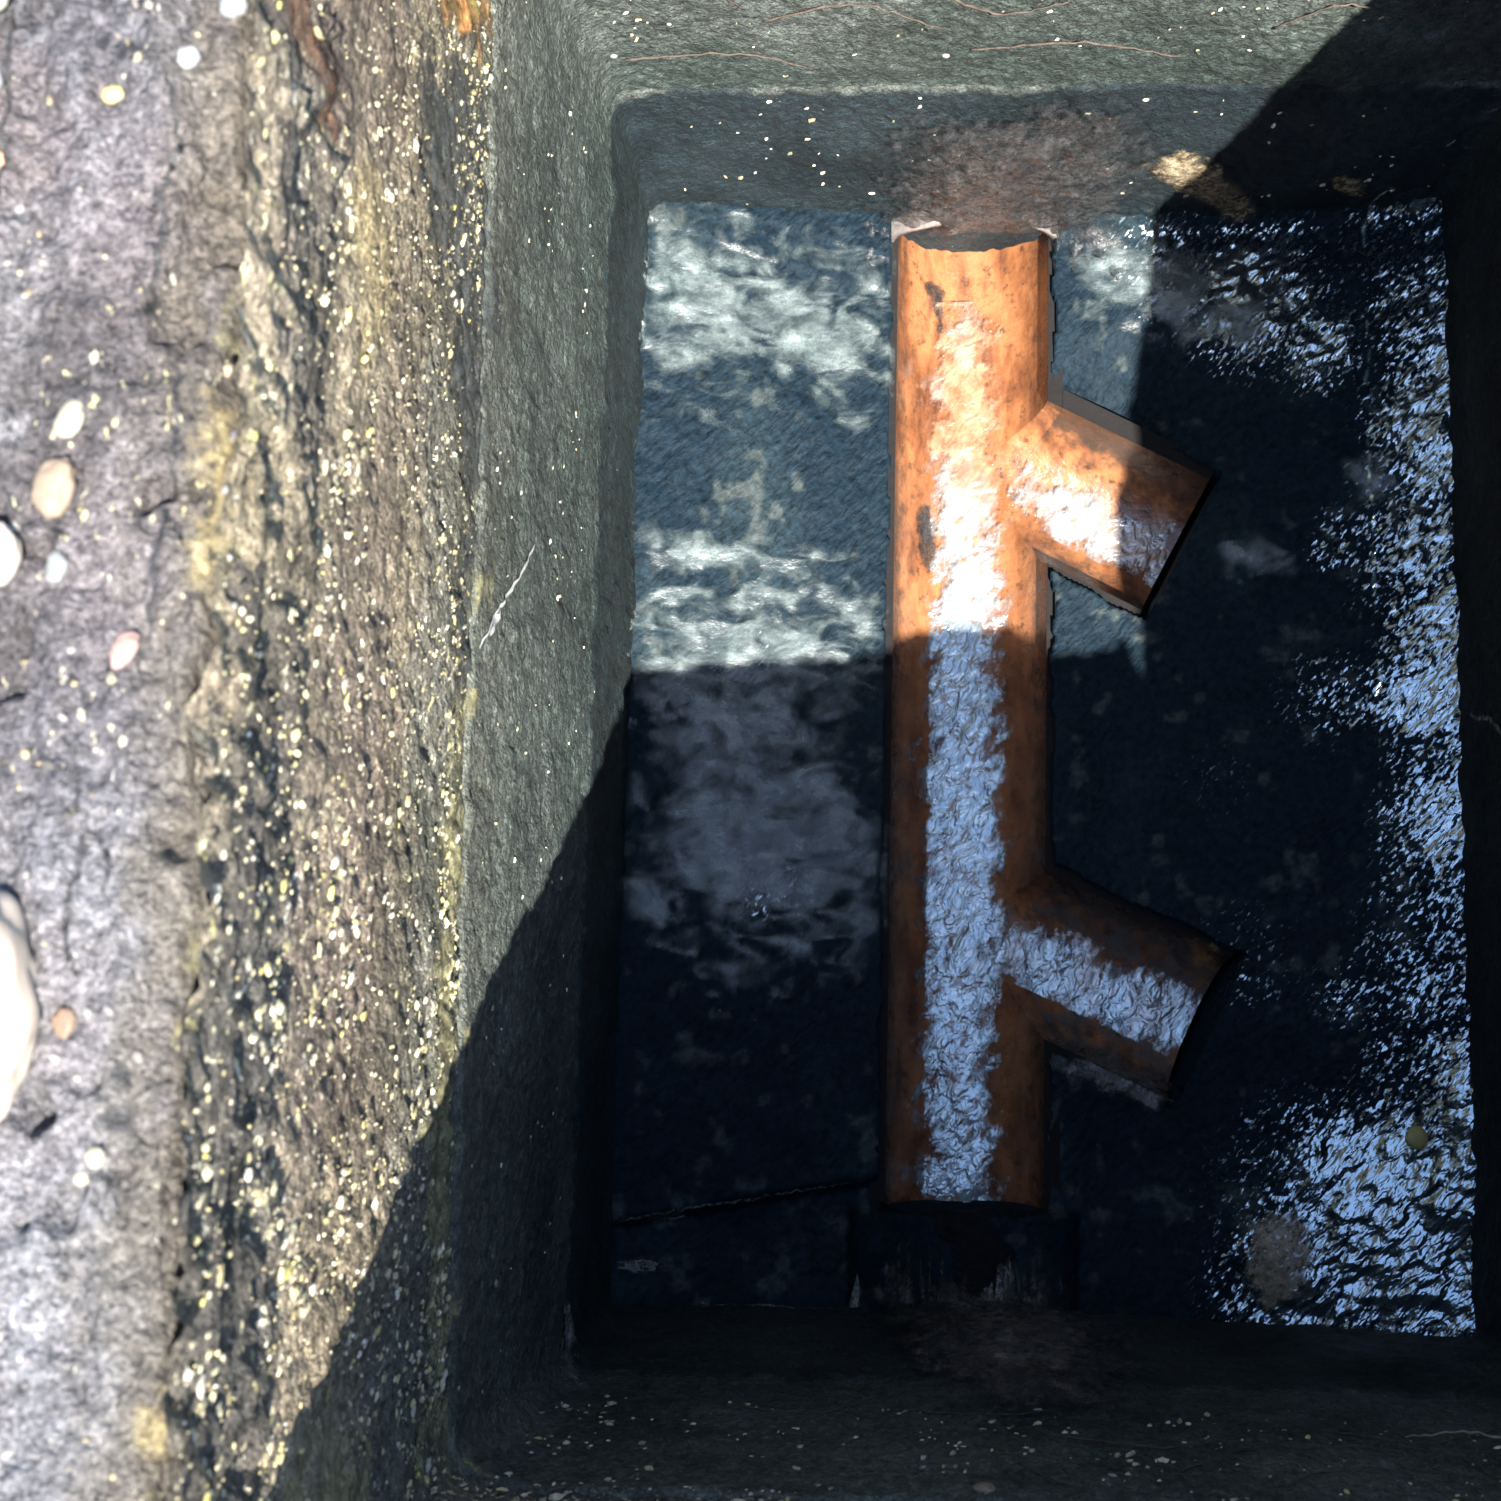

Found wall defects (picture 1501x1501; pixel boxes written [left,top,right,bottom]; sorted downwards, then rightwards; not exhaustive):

corrosion [439,0,494,61]
leakage [642,238,891,402]
leakage [925,282,945,333]
leakage [1079,250,1260,343]
leakage [1352,461,1384,499]
leakage [672,532,765,568]
leakage [658,588,711,602]
leakage [647,593,870,917]
leakage [632,883,668,925]
leakage [1064,1050,1163,1111]
leakage [701,1273,863,1309]
leakage [1246,1213,1321,1310]